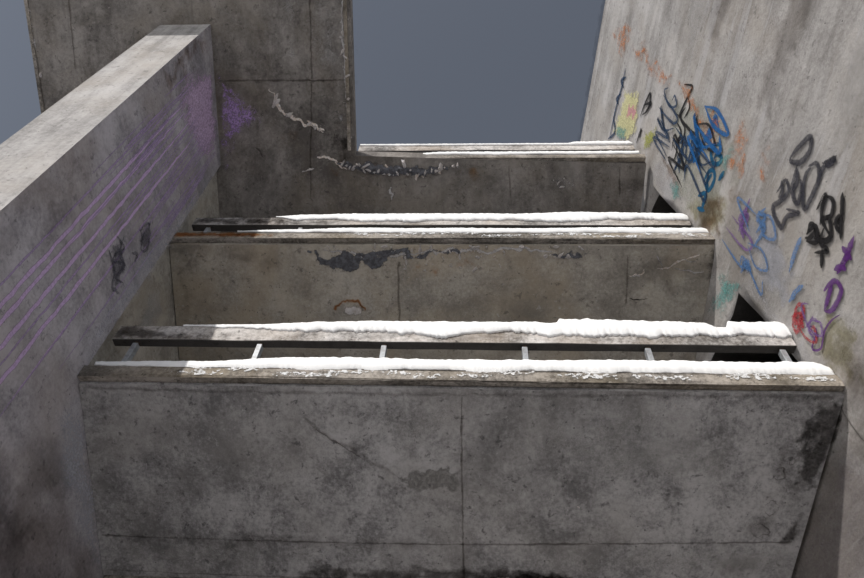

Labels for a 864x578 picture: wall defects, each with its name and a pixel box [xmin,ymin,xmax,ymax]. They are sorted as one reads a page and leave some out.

spalling [337,159,458,180]
peeling [307,243,586,272]